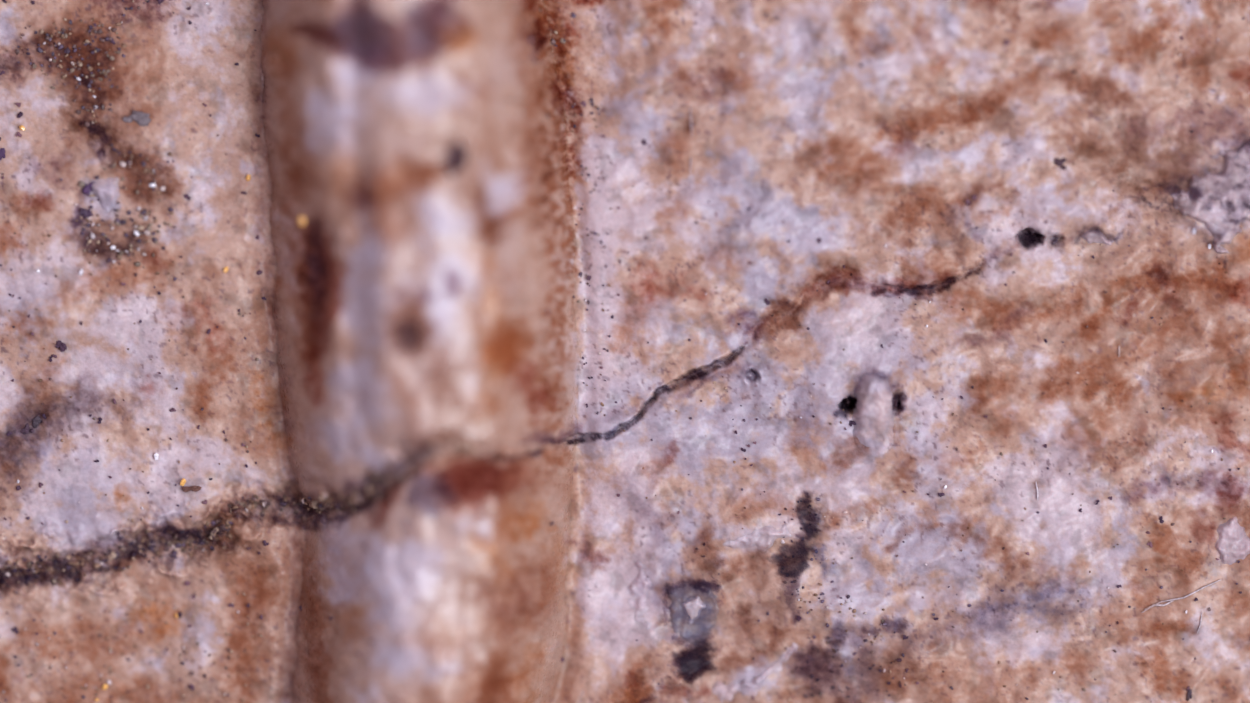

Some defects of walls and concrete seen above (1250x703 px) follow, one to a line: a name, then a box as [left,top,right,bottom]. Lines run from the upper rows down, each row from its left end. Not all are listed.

crack [900,270,978,294]
crack [571,355,734,443]
crack [0,441,476,594]